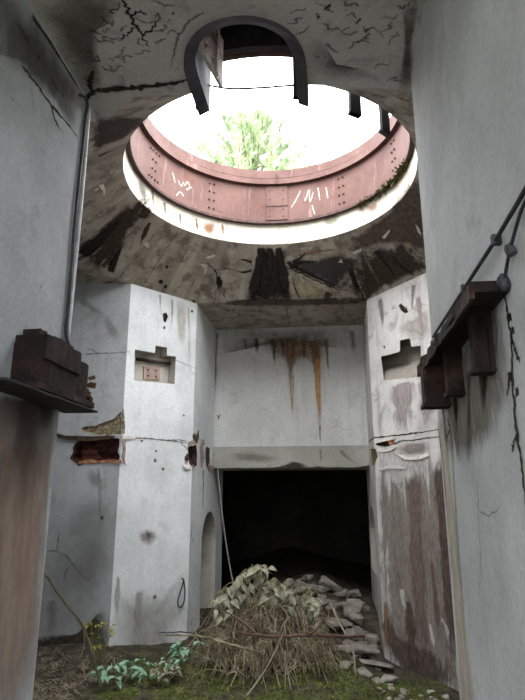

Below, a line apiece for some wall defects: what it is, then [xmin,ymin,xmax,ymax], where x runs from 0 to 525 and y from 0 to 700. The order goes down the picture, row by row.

crack [86,0,204,100]
crack [287,1,410,52]
crack [22,65,78,137]
crack [206,262,240,300]
water stain [219,248,364,306]
water stain [407,285,427,335]
corrosion [271,339,329,416]
crack [504,296,525,496]
spalling [57,408,143,465]
spalling [182,430,215,496]
water stain [380,308,502,700]